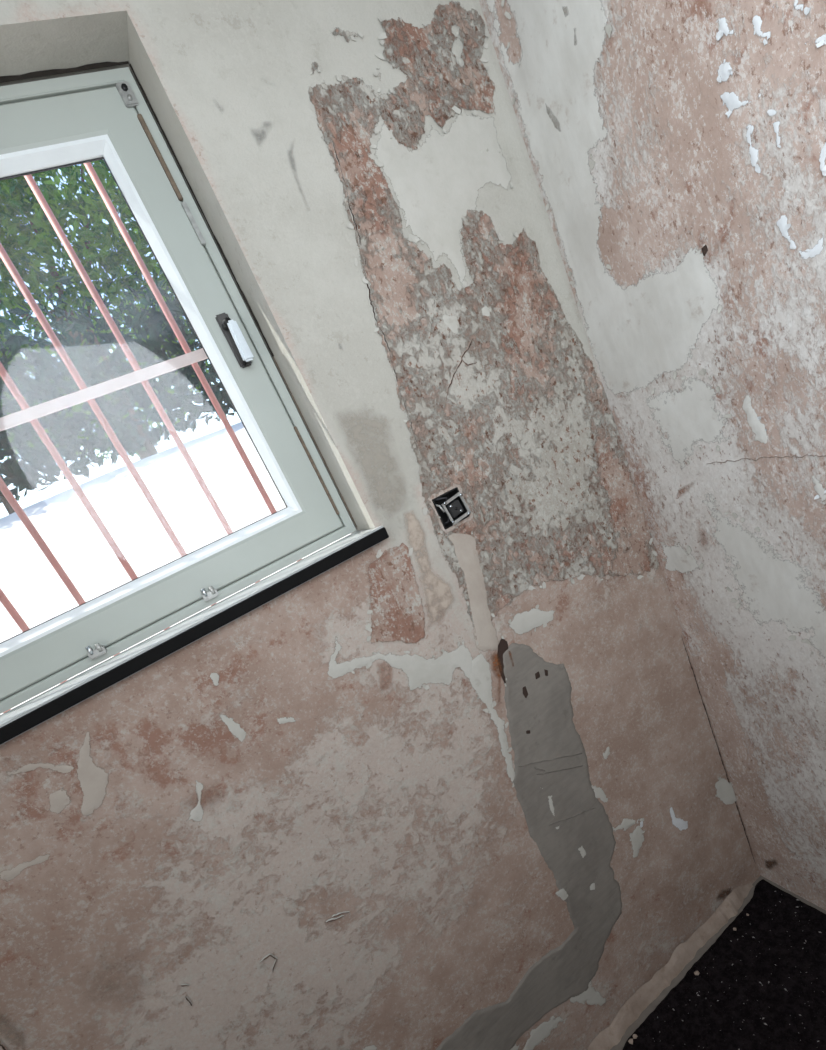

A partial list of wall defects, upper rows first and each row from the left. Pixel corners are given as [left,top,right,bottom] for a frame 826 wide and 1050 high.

peeling [716,17,736,41]
peeling [752,15,771,45]
peeling [794,0,811,15]
peeling [717,59,761,118]
peeling [746,125,761,173]
peeling [767,109,781,148]
peeling [776,215,824,259]
spalling [308,0,723,654]
peeling [742,395,768,444]
peeling [812,476,826,505]
spalling [497,636,508,686]
peeling [591,785,608,802]